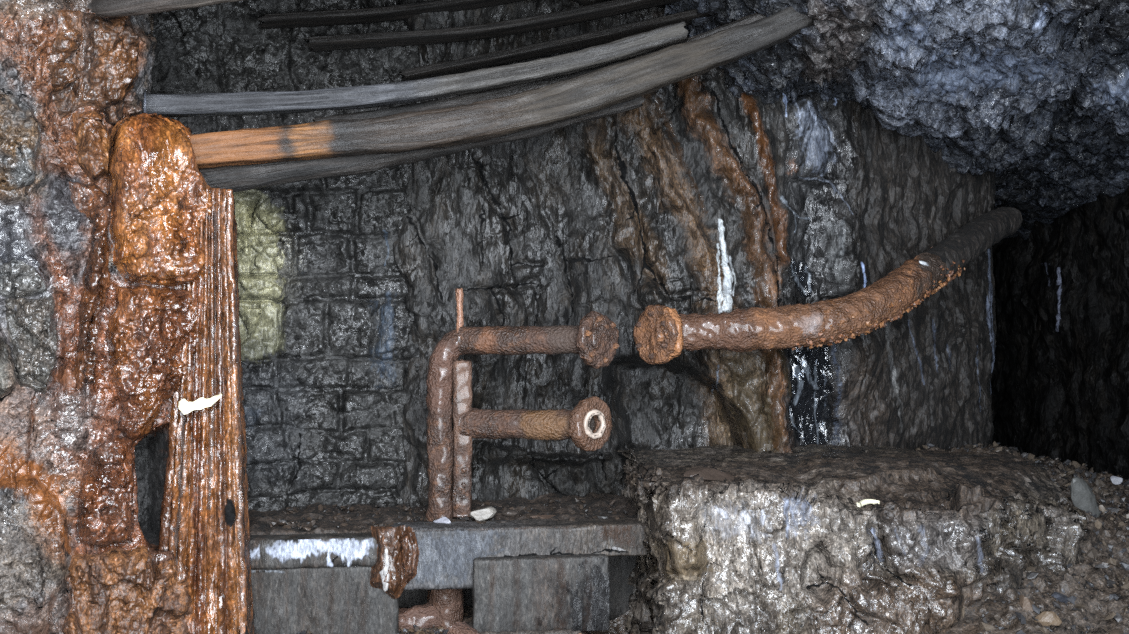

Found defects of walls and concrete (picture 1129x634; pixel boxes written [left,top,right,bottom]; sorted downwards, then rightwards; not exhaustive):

leakage [717,219,735,313]
rust [683,78,771,308]
rust [742,92,787,257]
rust [52,367,76,388]
leakage [207,211,218,509]
rust [0,404,77,556]
leakage [174,413,185,565]
leakage [239,530,374,573]
rust [370,525,494,599]